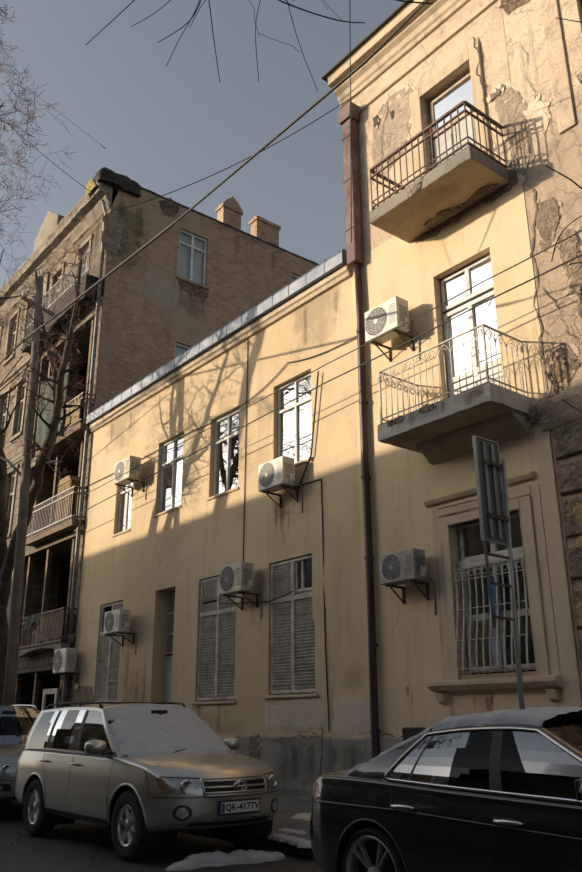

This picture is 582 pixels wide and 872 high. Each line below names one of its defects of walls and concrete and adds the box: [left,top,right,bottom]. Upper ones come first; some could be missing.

spalling [499,0,530,15]
peeling [371,83,416,182]
peeling [415,83,551,244]
spalling [158,197,180,218]
peeling [101,211,128,265]
spalling [533,197,582,303]
spalling [176,280,211,299]
spalling [548,342,582,383]